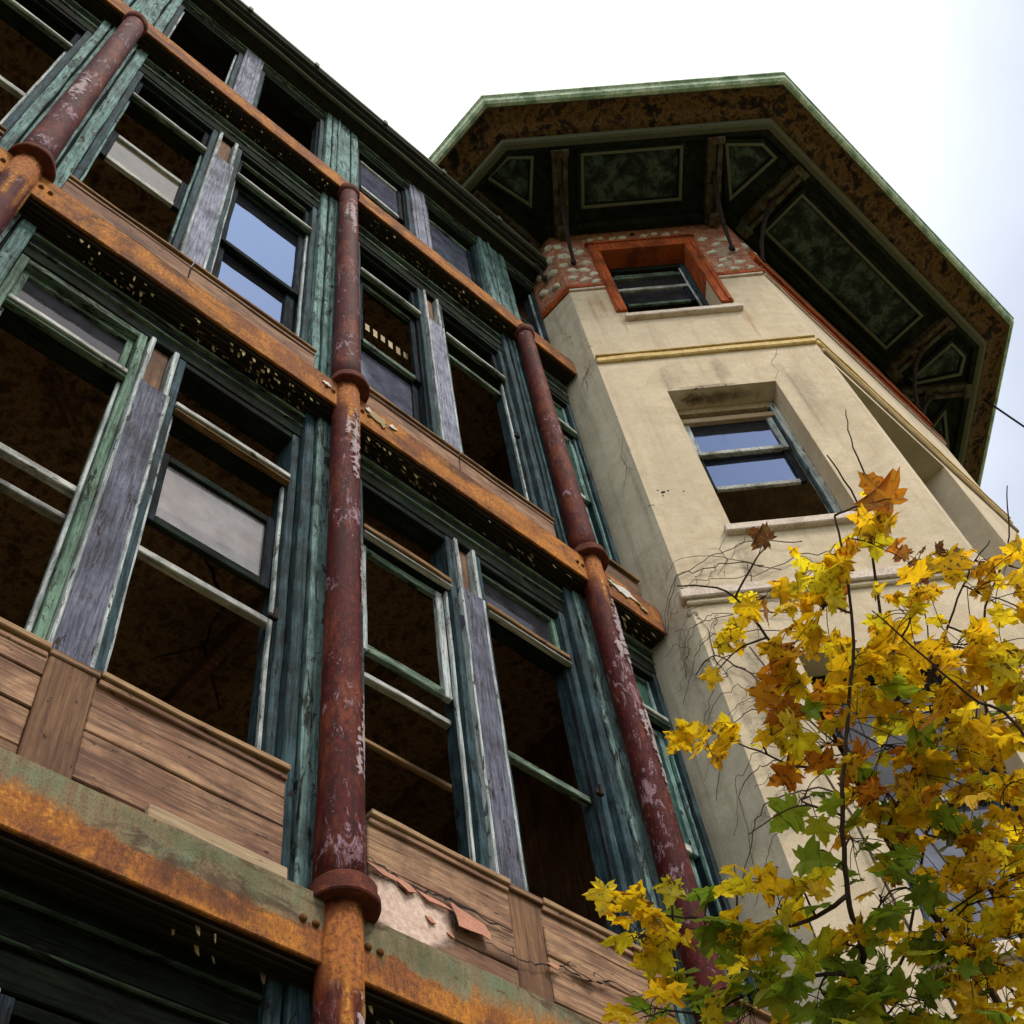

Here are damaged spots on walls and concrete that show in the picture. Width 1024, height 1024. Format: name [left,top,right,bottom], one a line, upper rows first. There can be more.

rust [1,155,40,207]
rust [133,251,230,321]
rust [337,384,360,426]
rust [586,557,640,606]
peeling [608,577,656,668]
peeling [639,702,670,792]
rust [0,783,75,830]
rust [321,905,365,1024]
peeling [366,861,491,946]
crack [366,856,644,996]